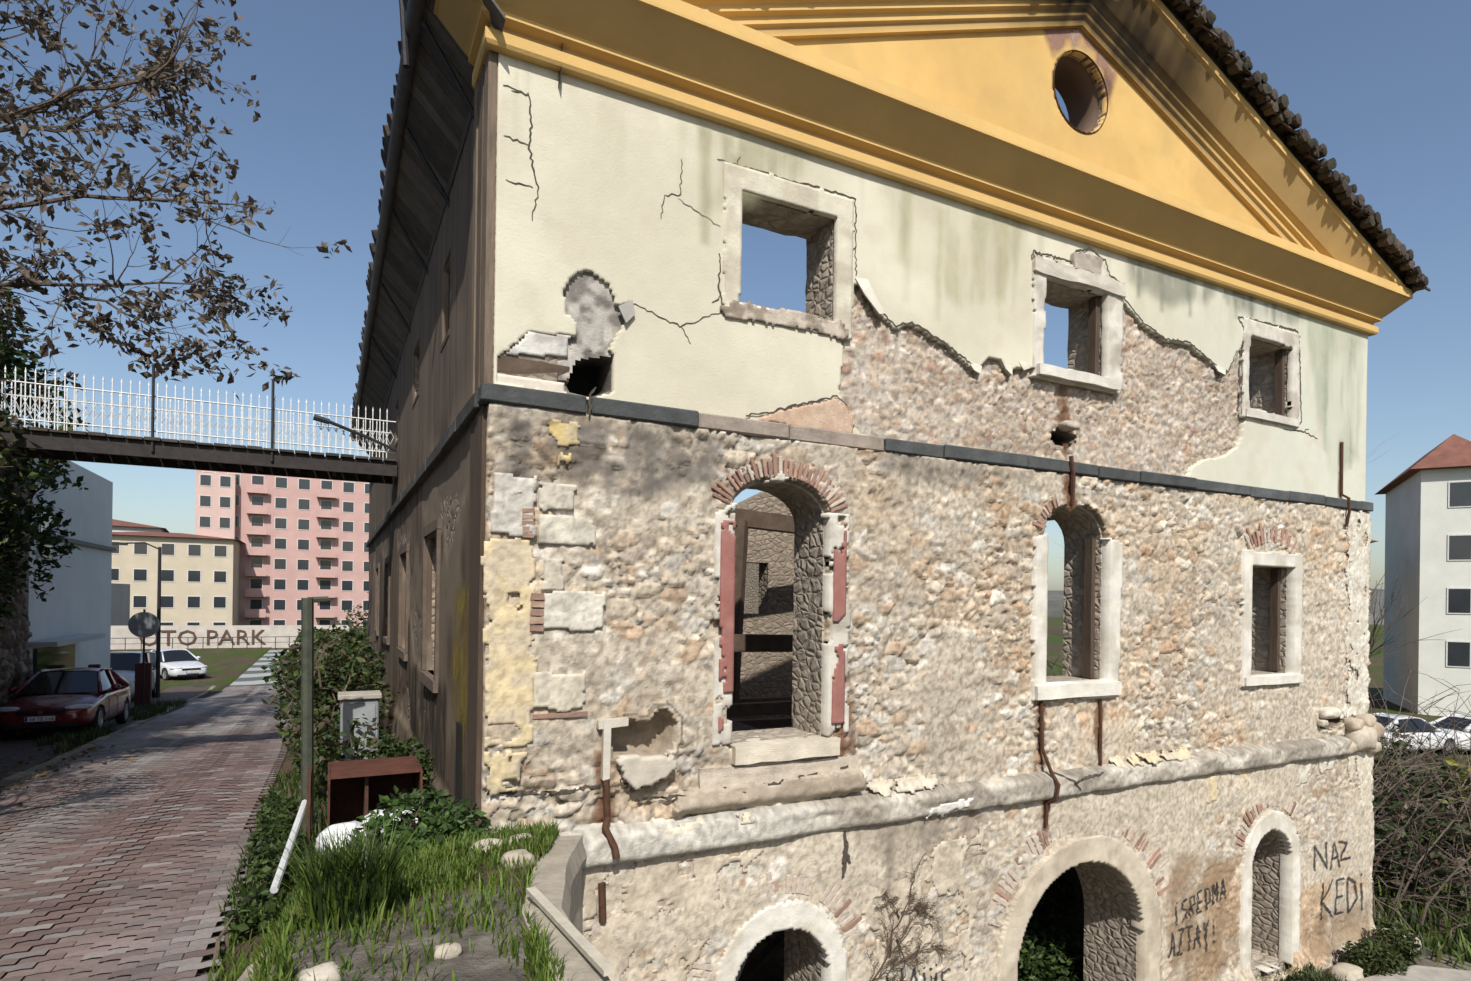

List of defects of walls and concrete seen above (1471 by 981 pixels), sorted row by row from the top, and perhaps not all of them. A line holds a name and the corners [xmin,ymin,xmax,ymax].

crack [503,85,539,220]
crack [633,157,858,344]
peeling [497,271,635,393]
peeling [720,278,1243,477]
rust [594,753,615,823]
spalling [611,709,678,791]
rust [1095,706,1103,742]